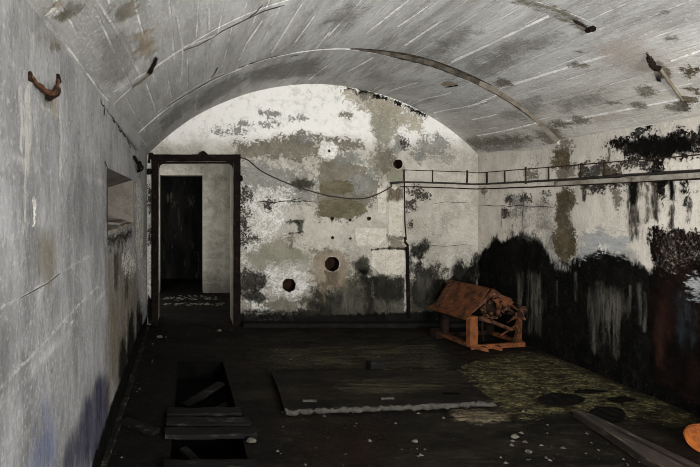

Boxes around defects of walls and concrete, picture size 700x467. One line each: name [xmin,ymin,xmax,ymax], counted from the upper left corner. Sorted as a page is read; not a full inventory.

water stain [386,167,405,201]
water stain [556,125,700,241]
crack [4,272,62,306]
water stain [240,199,700,416]